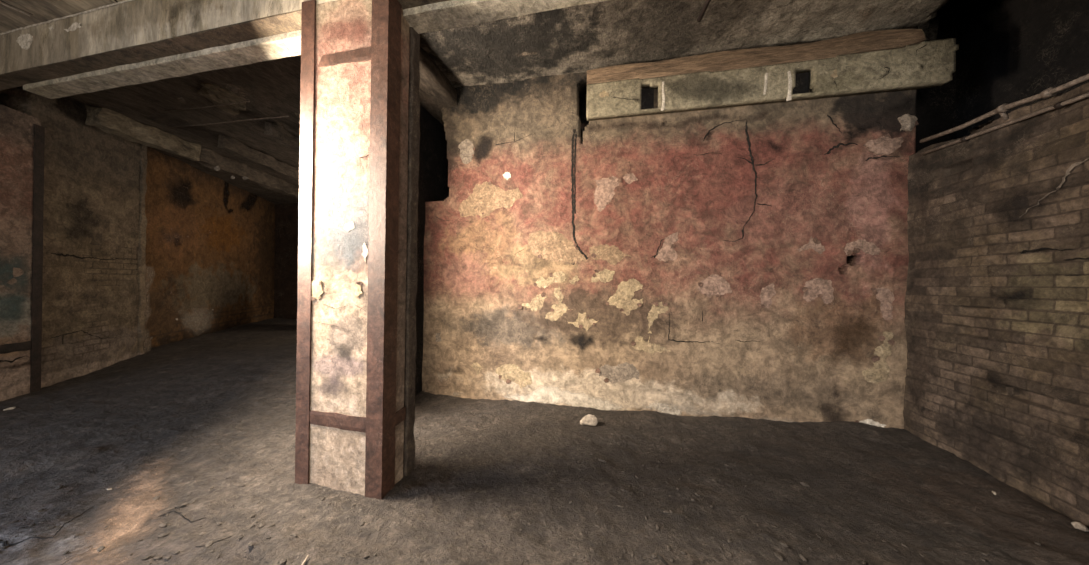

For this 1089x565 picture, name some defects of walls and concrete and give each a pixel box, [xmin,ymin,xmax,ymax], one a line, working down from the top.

crack [571,129,588,265]
peeling [594,173,638,212]
crack [694,119,775,242]
peeling [518,230,713,354]
peeling [698,274,732,298]
peeling [802,278,834,304]
peeling [595,362,639,384]